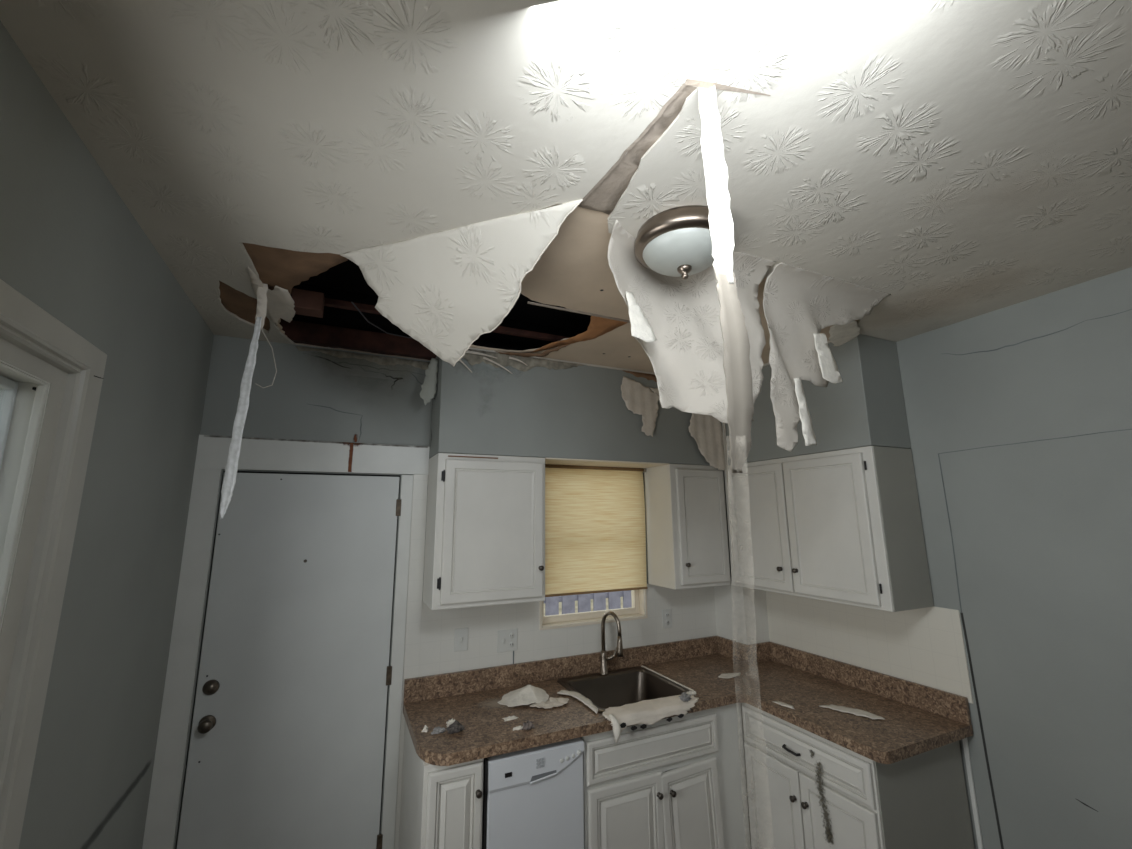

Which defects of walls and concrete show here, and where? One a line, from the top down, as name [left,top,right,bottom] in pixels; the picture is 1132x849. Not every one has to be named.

crack [946,309,1132,355]
peeling [420,358,439,405]
peeling [621,376,659,437]
rust [343,434,360,472]
peeling [689,413,726,472]